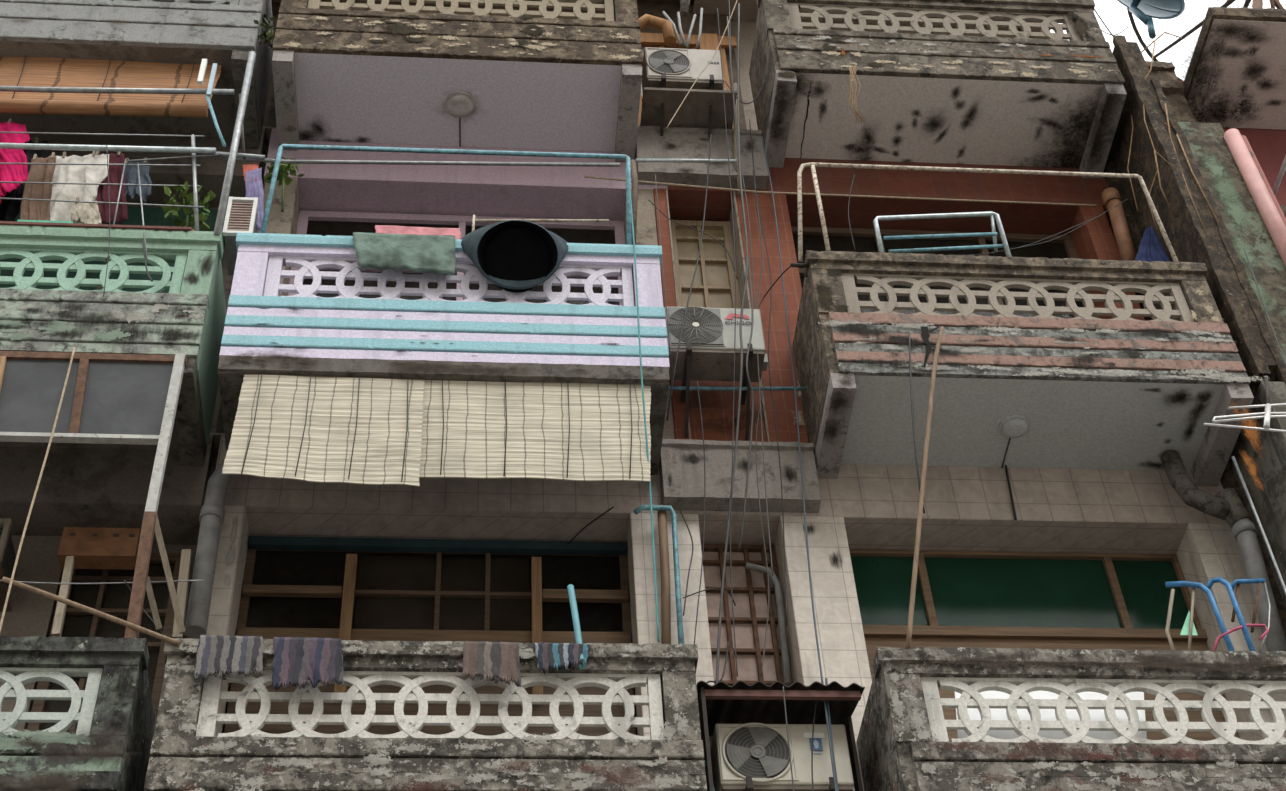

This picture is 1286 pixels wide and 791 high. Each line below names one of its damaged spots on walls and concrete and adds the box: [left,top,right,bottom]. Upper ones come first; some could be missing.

peeling [344,17,586,55]
water stain [1183,26,1281,123]
water stain [771,76,826,139]
water stain [846,111,945,162]
water stain [953,89,976,128]
water stain [1036,87,1125,168]
peeling [819,319,1266,382]
water stain [1145,388,1210,435]
peeling [0,729,91,776]
peeling [166,694,334,791]
peeling [418,733,700,791]
peeling [958,761,1194,791]